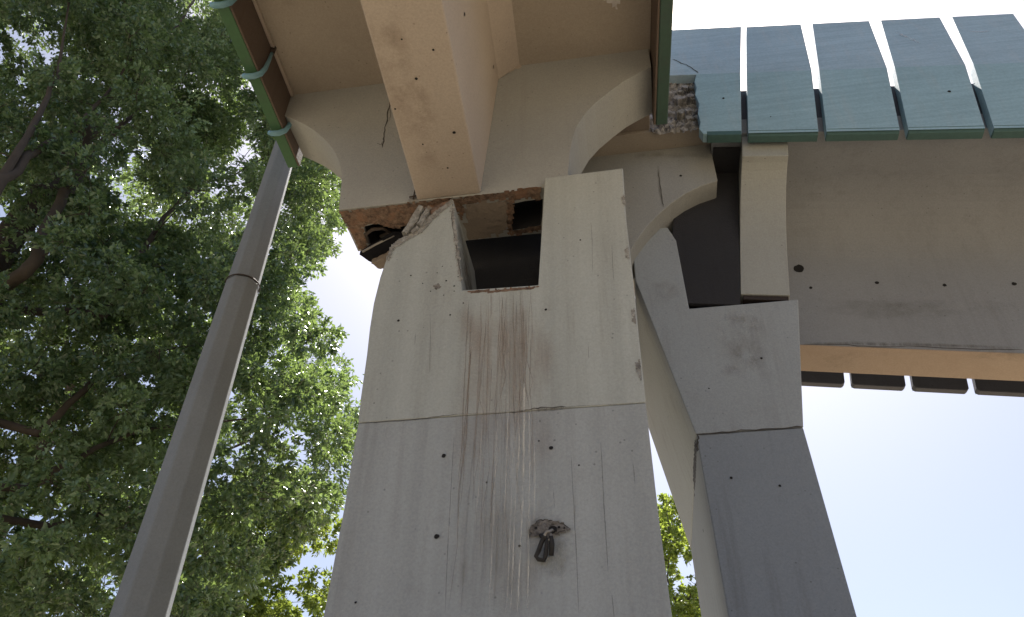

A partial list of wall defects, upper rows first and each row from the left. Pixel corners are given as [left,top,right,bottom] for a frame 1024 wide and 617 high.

crack [377,102,391,147]
spalling [649,83,699,135]
peeling [365,187,543,261]
crack [367,413,472,423]
crack [504,404,613,413]
crack [696,426,803,451]